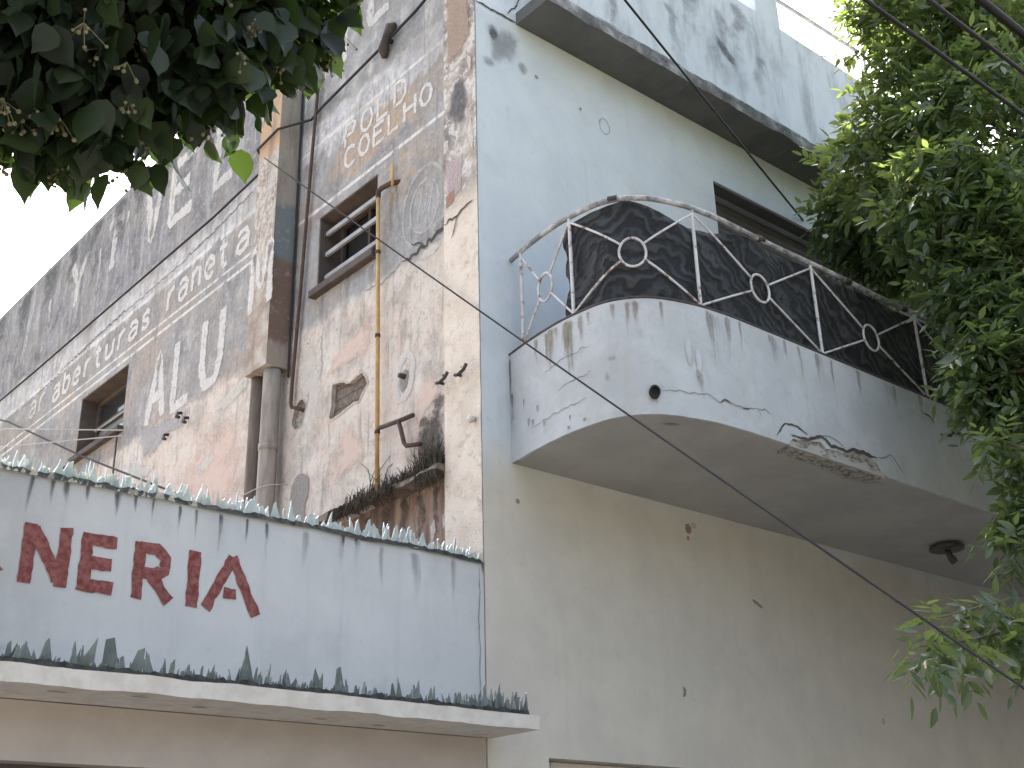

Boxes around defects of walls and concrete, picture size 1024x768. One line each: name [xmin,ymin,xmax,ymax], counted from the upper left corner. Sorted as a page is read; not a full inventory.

water stain [490,28,513,55]
water stain [449,82,473,146]
crack [366,199,473,291]
peeling [291,322,370,433]
water stain [418,395,444,458]
crack [662,389,905,475]
spalling [776,439,887,482]